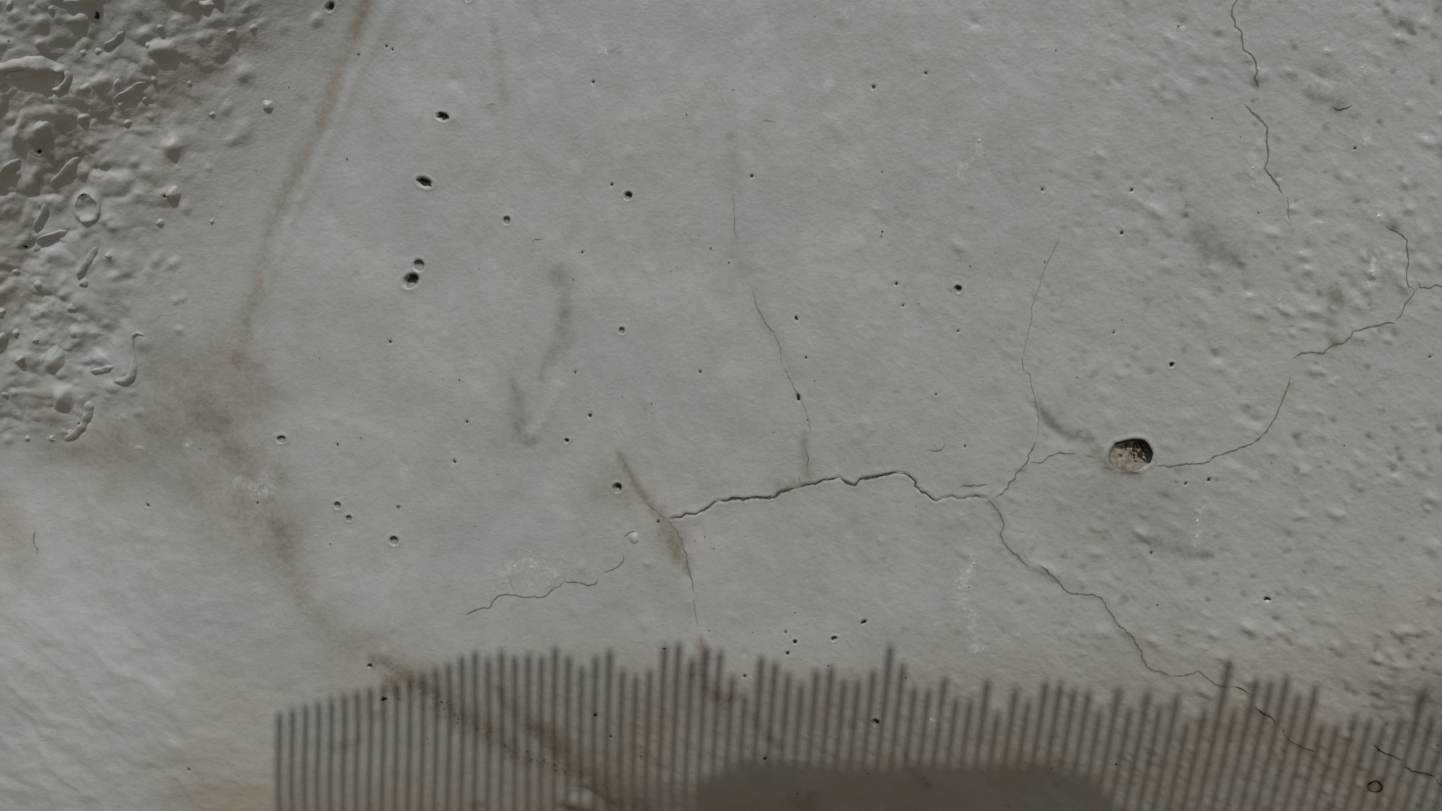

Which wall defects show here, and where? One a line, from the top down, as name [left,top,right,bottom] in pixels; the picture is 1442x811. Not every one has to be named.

crack [1231,0,1291,220]
crack [1158,224,1442,467]
crack [467,236,1317,752]